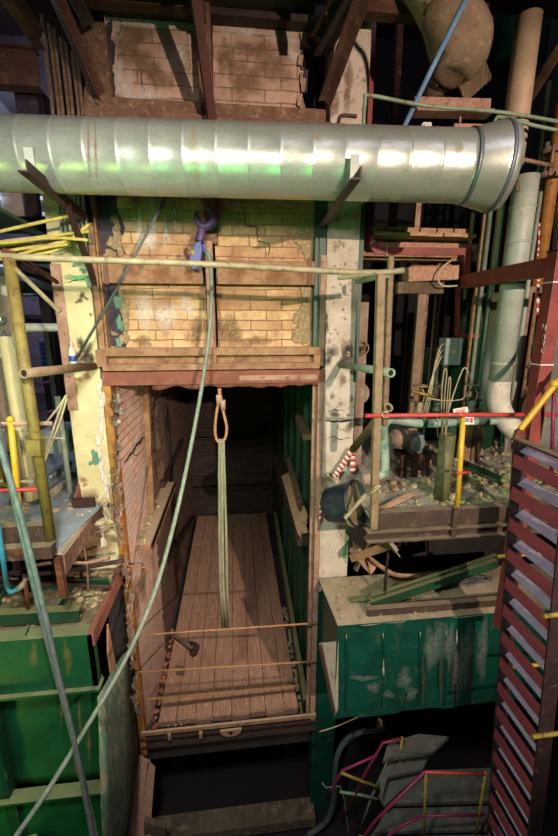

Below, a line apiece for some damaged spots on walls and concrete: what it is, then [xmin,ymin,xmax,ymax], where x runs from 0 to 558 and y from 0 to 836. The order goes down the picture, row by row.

spalling [297,31,318,109]
crack [239,199,270,255]
peeling [291,286,313,346]
spalling [88,379,140,548]
spalling [121,555,143,716]